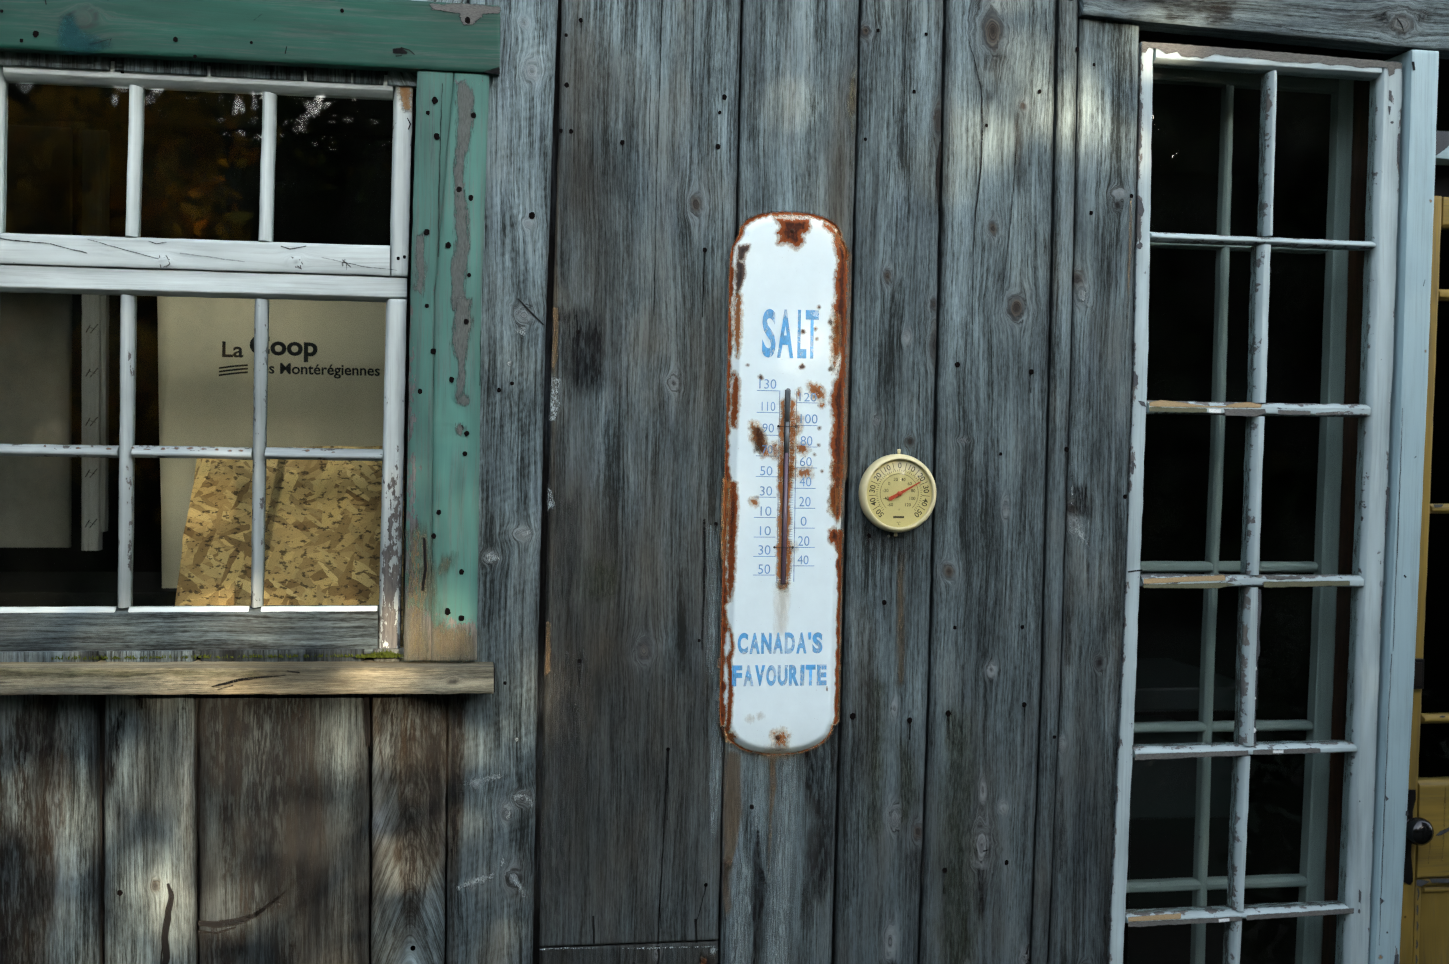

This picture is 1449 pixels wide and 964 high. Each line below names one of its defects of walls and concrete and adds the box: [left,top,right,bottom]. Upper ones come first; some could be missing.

peeling [429,3,501,25]
peeling [451,80,474,406]
peeling [1134,372,1338,417]
rust [718,211,850,870]
peeling [1135,575,1350,760]
peeling [1128,890,1361,927]